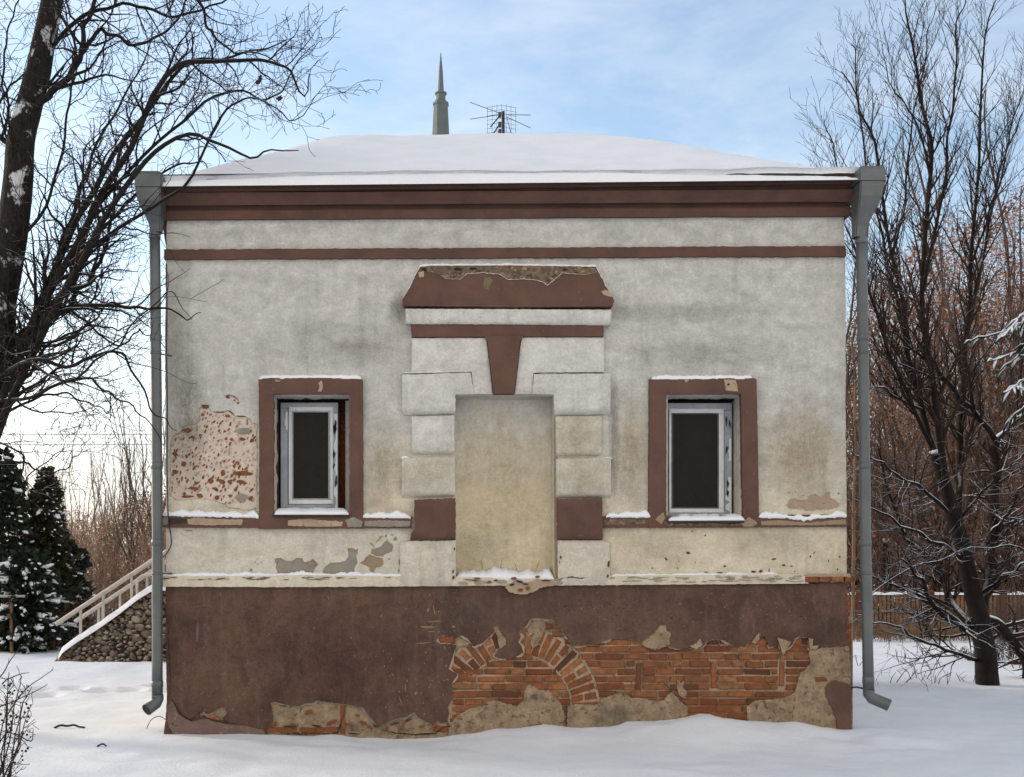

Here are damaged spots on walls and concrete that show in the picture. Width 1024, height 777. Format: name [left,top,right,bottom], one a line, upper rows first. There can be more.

flaking render [418,265,597,290]
flaking render [163,394,258,531]
spalling [242,380,410,580]
peeling [604,491,846,527]
flaking render [200,706,227,722]
flaking render [266,573,855,739]